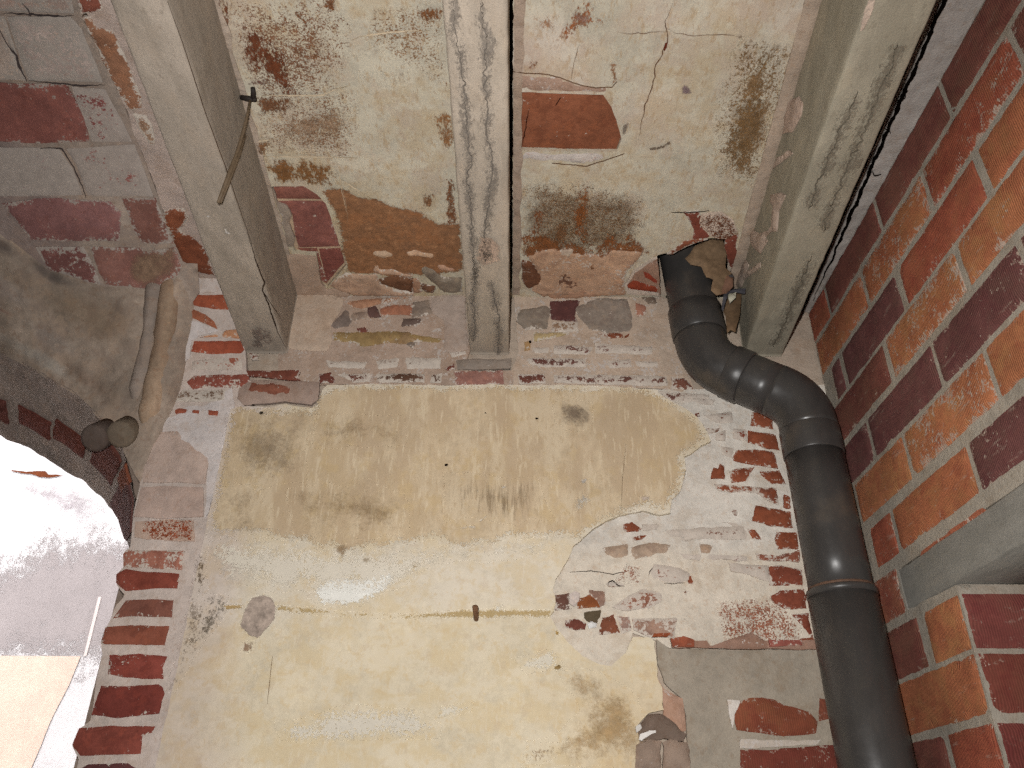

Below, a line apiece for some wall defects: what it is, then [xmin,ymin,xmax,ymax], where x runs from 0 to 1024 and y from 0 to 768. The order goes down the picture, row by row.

leakage [523,182,643,251]
crack [620,3,738,133]
leakage [715,42,788,181]
crack [813,0,947,301]
spalling [278,210,814,666]